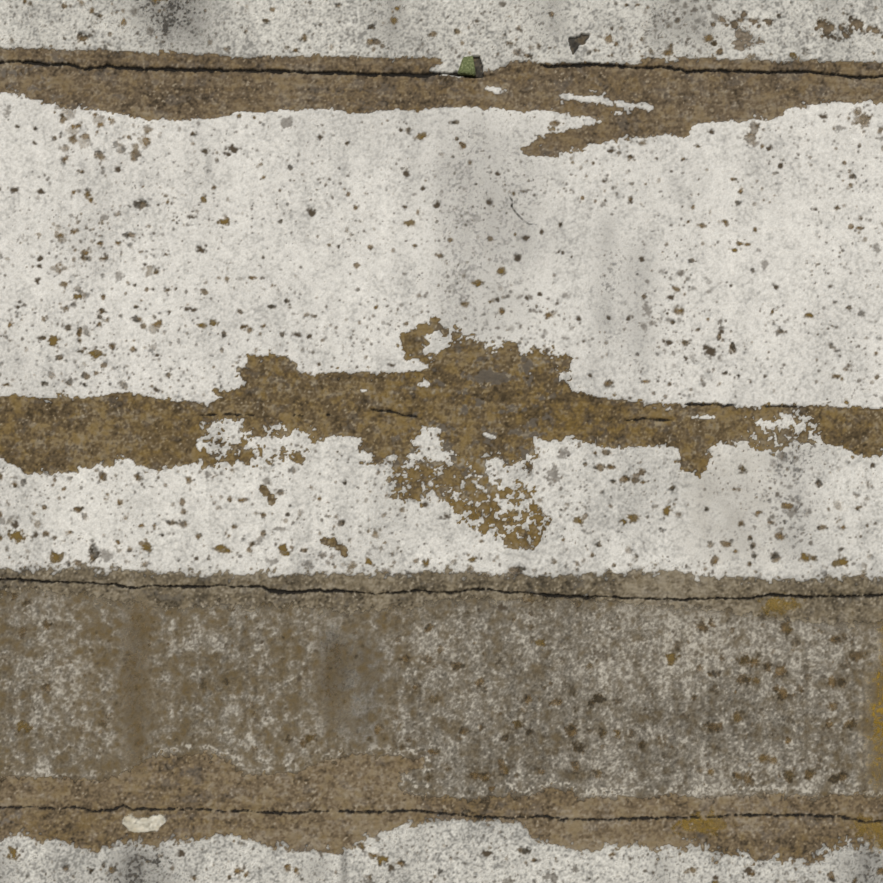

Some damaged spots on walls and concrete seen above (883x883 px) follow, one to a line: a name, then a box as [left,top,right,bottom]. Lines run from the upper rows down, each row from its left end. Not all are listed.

crack [0,60,476,78]
crack [540,63,883,80]
peeling [0,11,883,158]
peeling [0,316,883,550]
peeling [320,537,348,558]
crack [0,578,883,601]
peeling [0,561,883,631]
peeling [0,749,883,866]
crack [0,804,883,823]